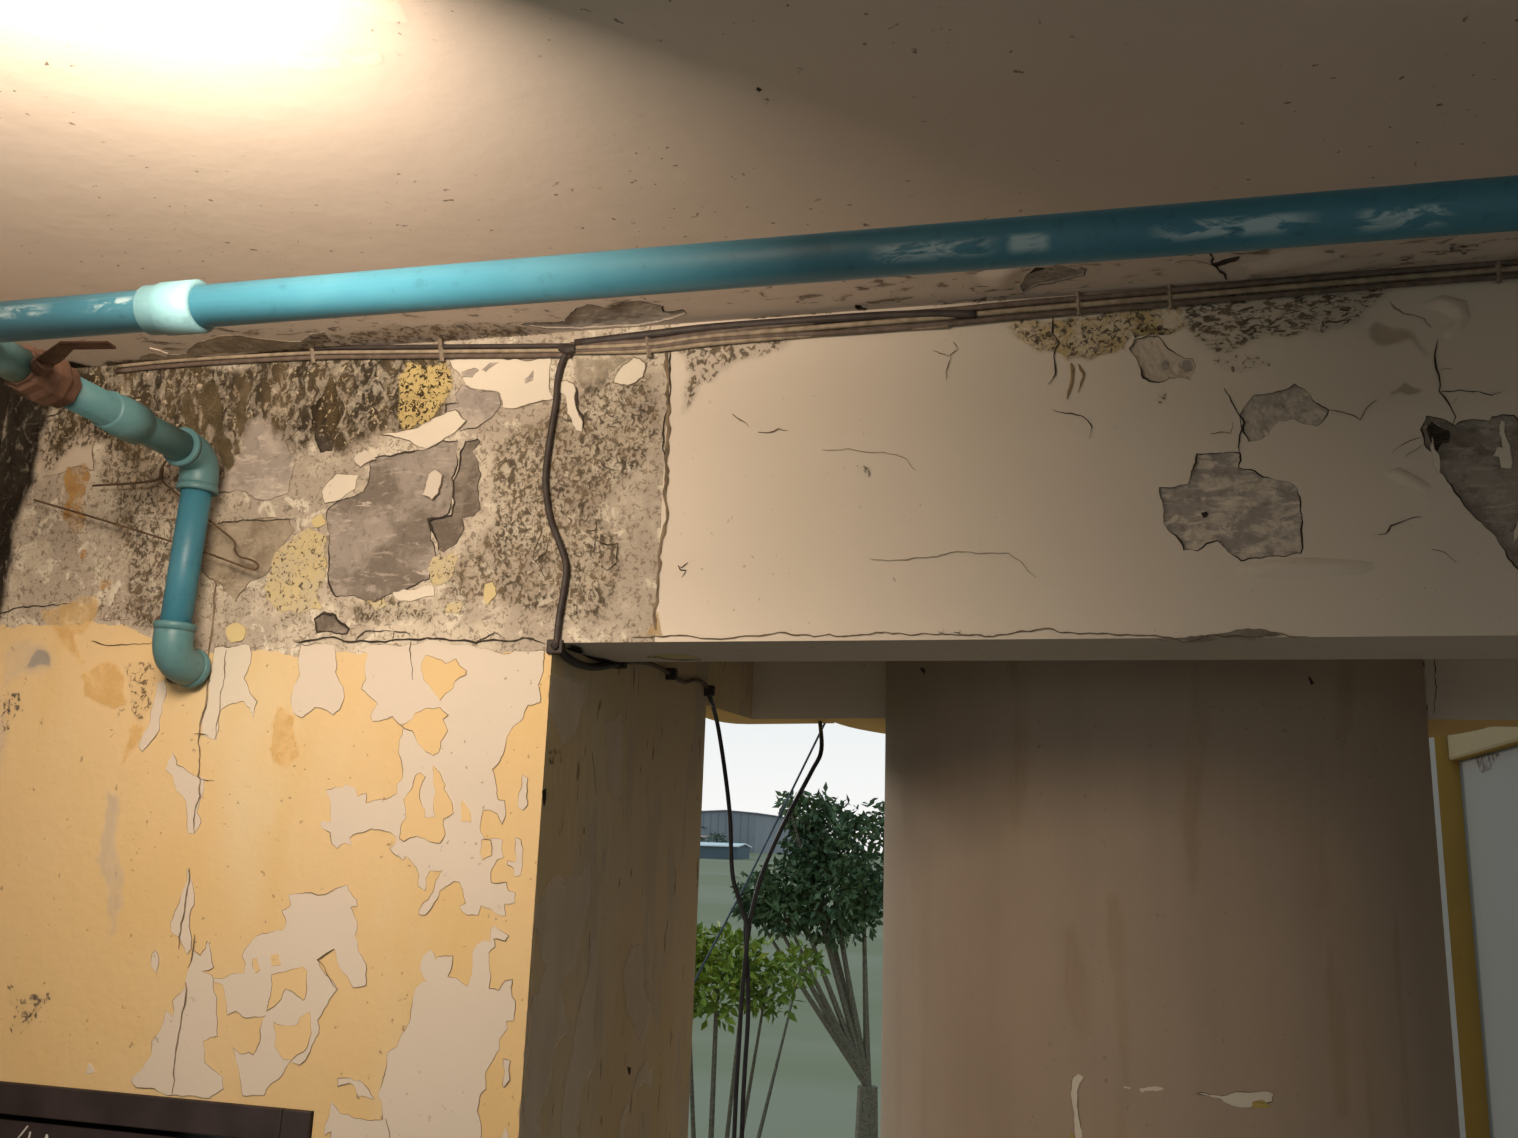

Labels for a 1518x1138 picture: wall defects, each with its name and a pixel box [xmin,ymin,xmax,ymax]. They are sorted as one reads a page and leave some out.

peeling [126,332,331,364]
peeling [614,357,646,386]
flaking render [1129,326,1196,383]
peeling [31,422,96,477]
flaking render [201,386,345,601]
flaking render [1159,384,1329,561]
flaking render [1420,414,1518,569]
peeling [139,680,167,752]
peeling [166,753,205,834]
peeling [202,644,257,740]
peeling [291,358,590,1138]
peeling [131,869,367,1099]